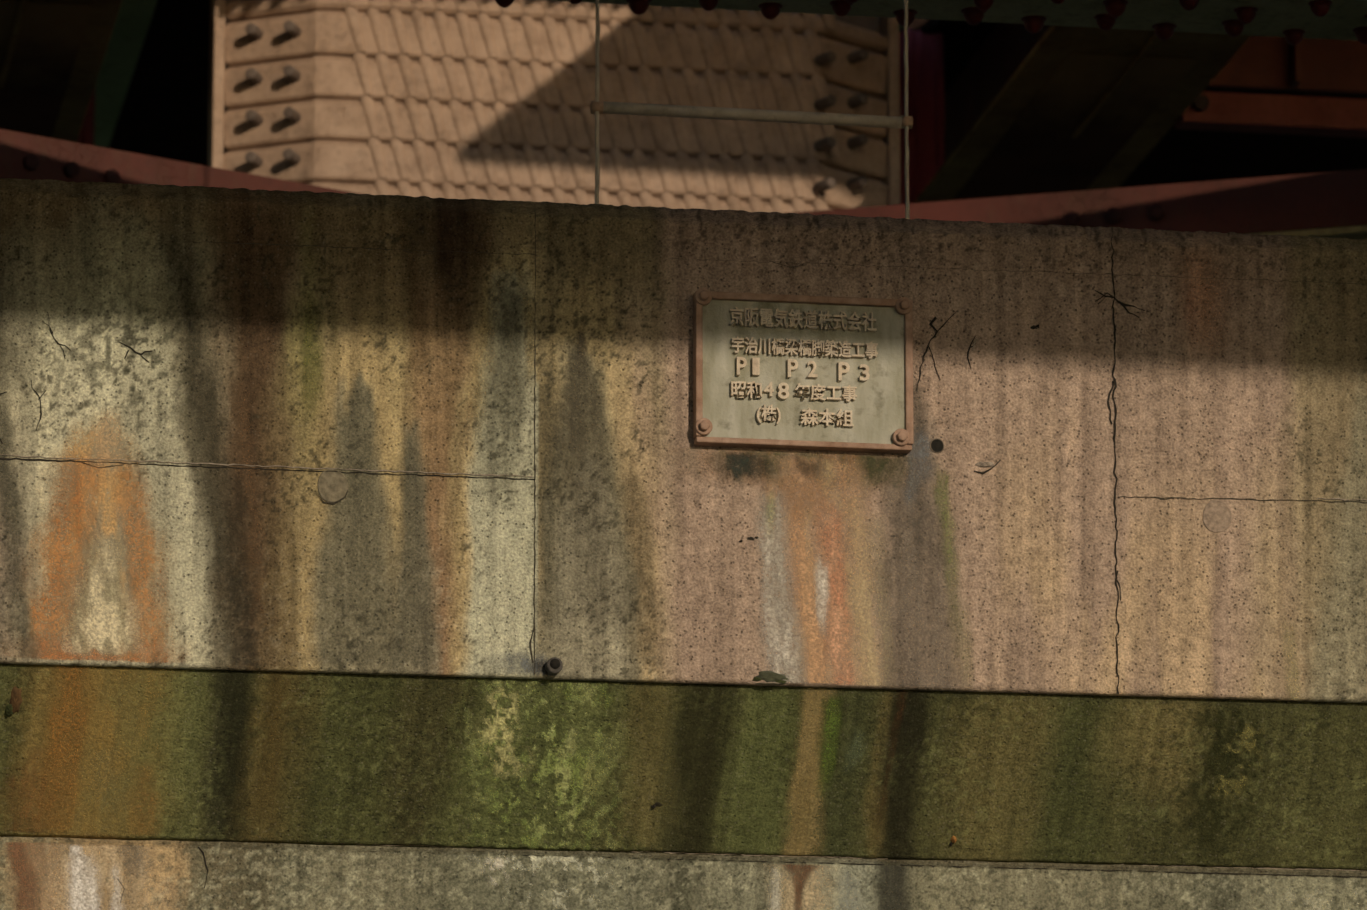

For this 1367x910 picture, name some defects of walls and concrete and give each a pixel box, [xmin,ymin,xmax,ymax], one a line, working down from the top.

corrosion [33,423,156,661]
water stain [543,332,600,494]
crack [666,229,1367,694]